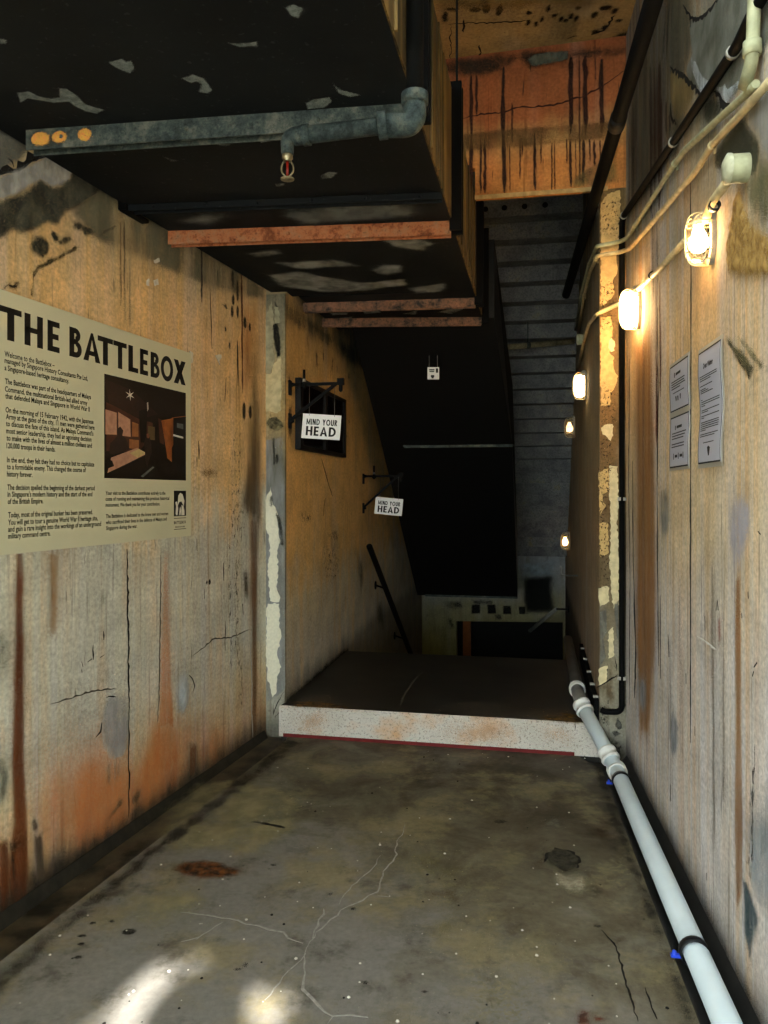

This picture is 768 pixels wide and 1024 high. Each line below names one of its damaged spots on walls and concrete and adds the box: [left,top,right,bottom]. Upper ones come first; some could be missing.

crack [181,826,405,1024]